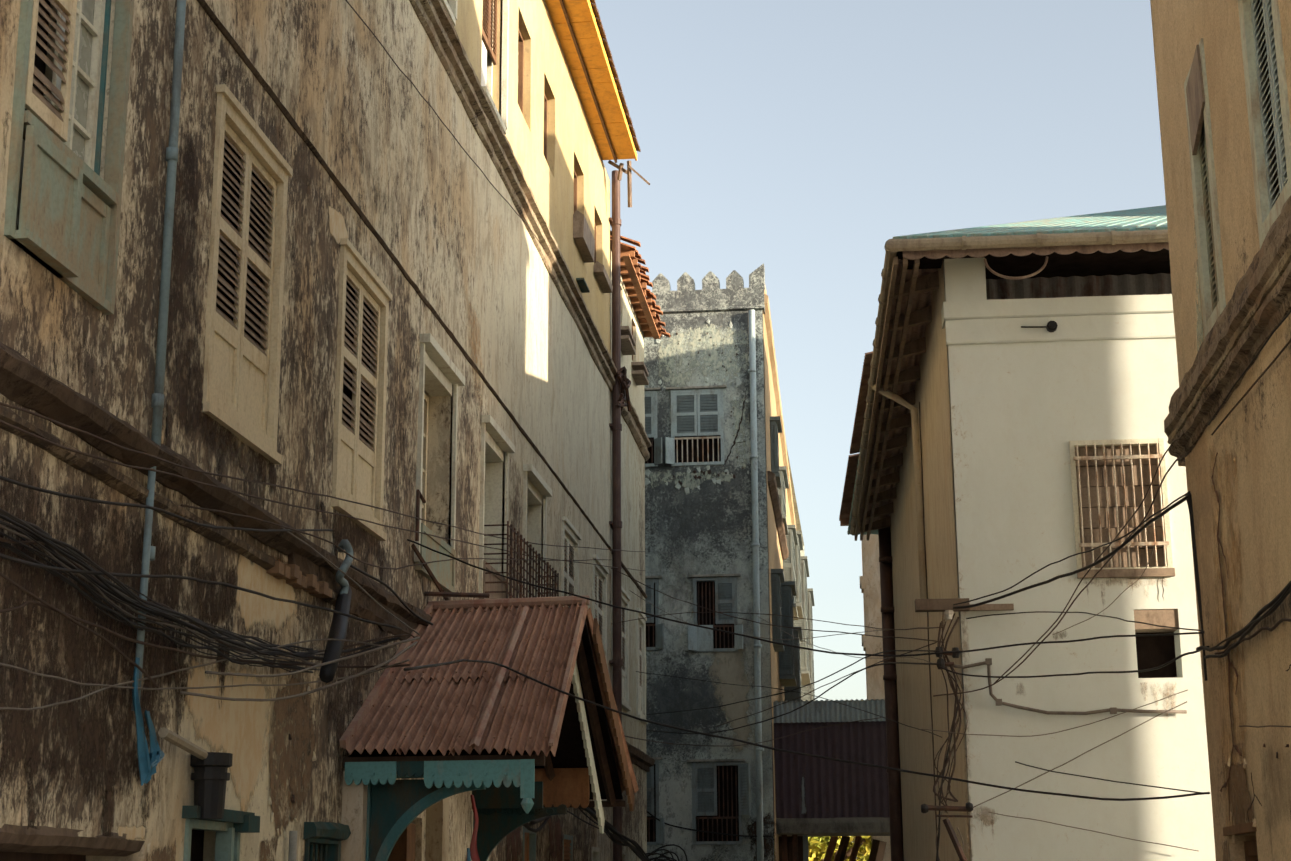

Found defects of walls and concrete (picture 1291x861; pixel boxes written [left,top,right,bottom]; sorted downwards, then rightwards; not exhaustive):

leakage [165,135,279,509]
leakage [0,454,238,837]
peeling [117,825,176,861]
peeling [186,657,317,861]